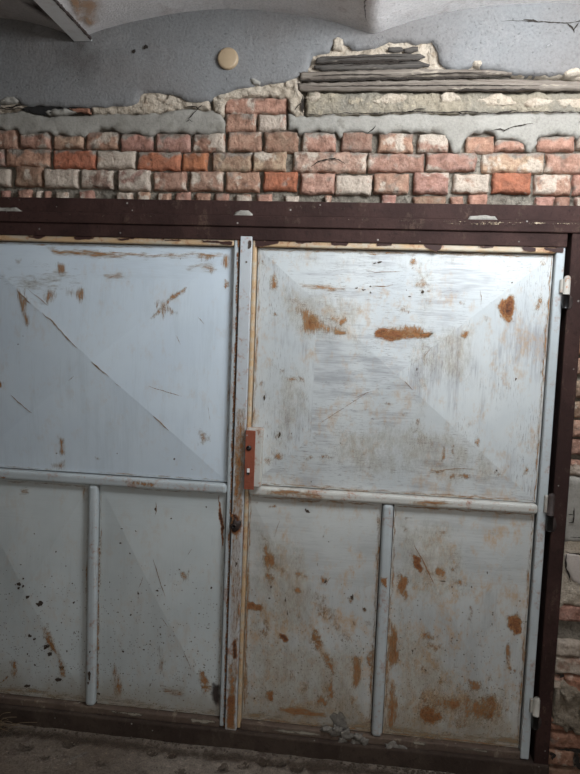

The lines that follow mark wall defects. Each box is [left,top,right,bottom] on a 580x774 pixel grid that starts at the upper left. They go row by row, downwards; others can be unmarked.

crack [509,19,580,31]
flaking render [308,42,447,72]
flaking render [0,77,580,118]
crack [565,510,580,582]
flaking render [564,554,580,586]